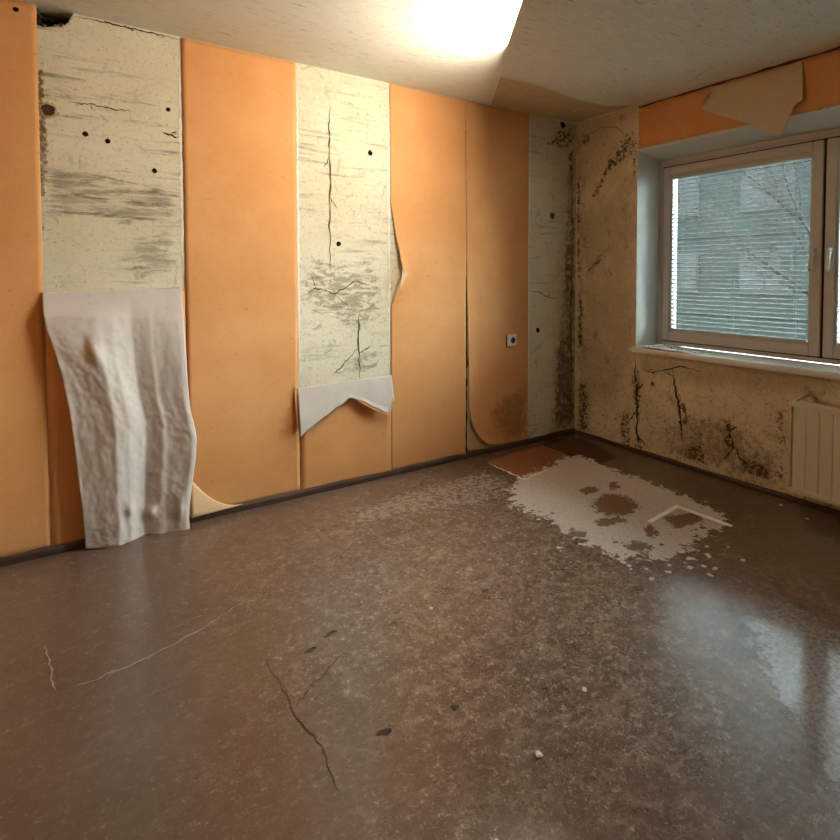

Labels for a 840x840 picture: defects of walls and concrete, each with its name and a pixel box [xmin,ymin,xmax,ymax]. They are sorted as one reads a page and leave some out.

spalling [36,8,74,29]
spalling [38,101,60,119]
peeling [702,61,803,136]
water stain [592,131,637,197]
crack [300,107,373,378]
peeling [41,287,242,549]
peeling [295,375,395,437]
water stain [620,371,644,450]
crack [630,355,698,450]
crack [723,419,748,465]
water stain [742,457,783,482]
peeling [503,455,728,580]